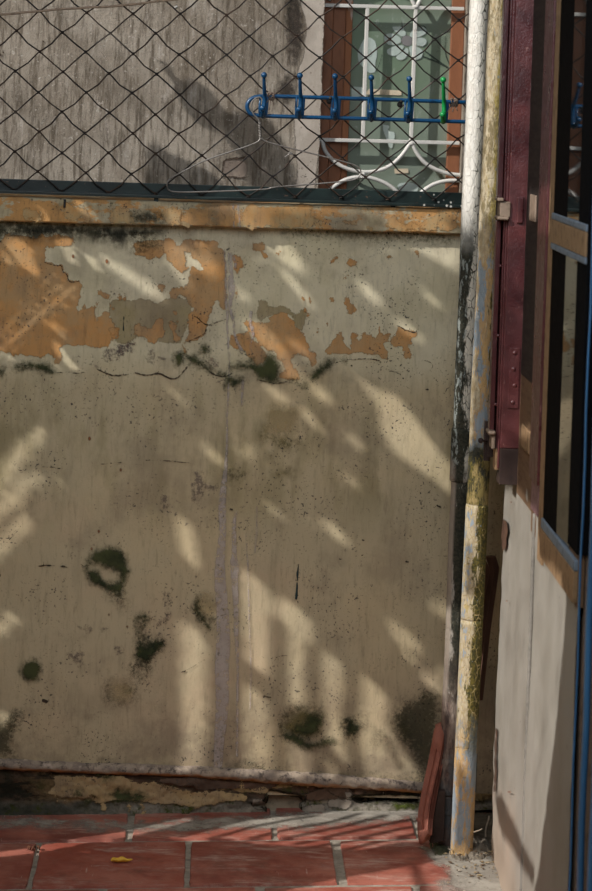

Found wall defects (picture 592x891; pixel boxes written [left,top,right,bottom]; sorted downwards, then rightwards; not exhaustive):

peeling [108,206,134,224]
peeling [162,206,190,228]
peeling [219,203,322,231]
peeling [378,209,458,232]
peeling [0,233,245,364]
peeling [229,296,417,380]
water stain [85,546,130,599]
water stain [135,613,171,670]
water stain [20,659,41,681]
water stain [280,708,335,749]
water stain [341,718,359,736]
water stain [110,788,145,802]